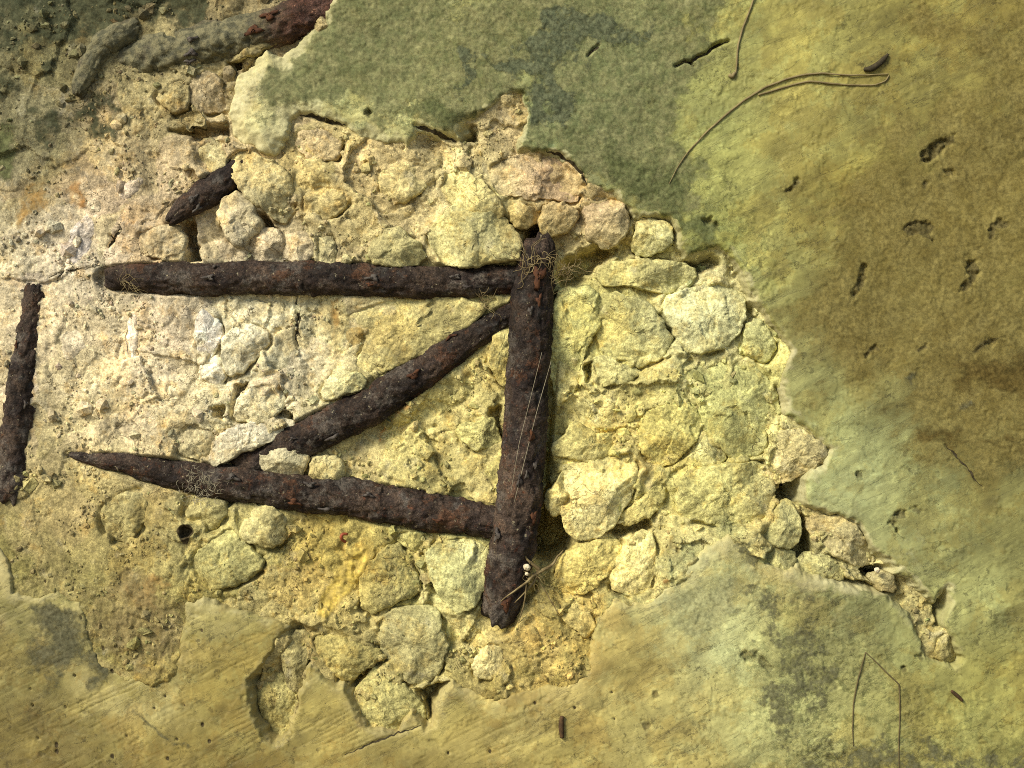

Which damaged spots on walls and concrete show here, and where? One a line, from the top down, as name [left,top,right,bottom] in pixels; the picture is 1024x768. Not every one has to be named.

rust [71,0,333,99]
crack [675,42,727,67]
rust [165,160,243,226]
rust [0,283,45,506]
rust [68,232,556,630]
spalling [0,0,802,736]
spalling [724,412,828,489]
spalling [790,501,956,663]